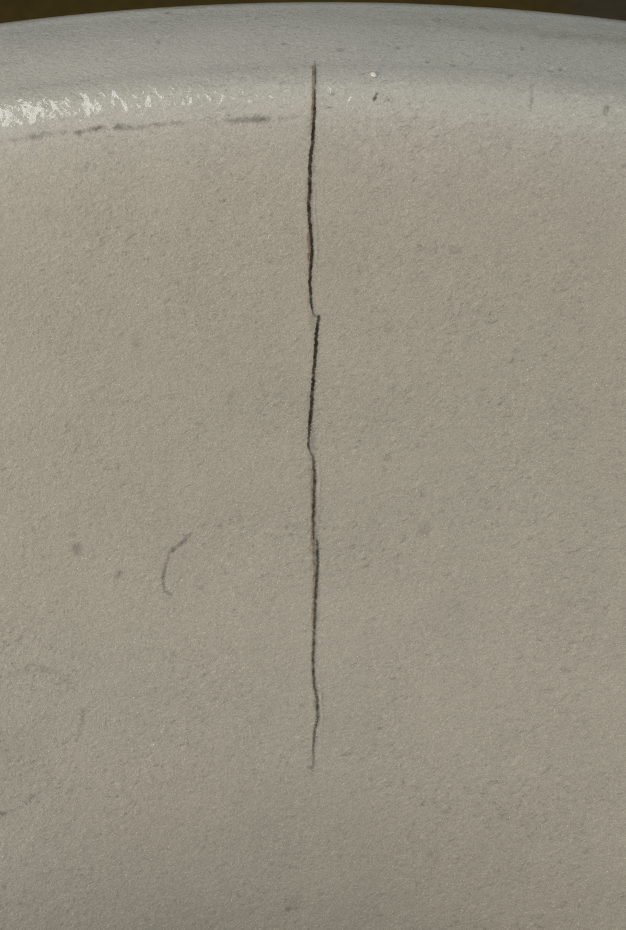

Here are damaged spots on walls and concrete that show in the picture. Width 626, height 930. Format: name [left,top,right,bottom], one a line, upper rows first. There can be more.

crack [307,66,320,741]